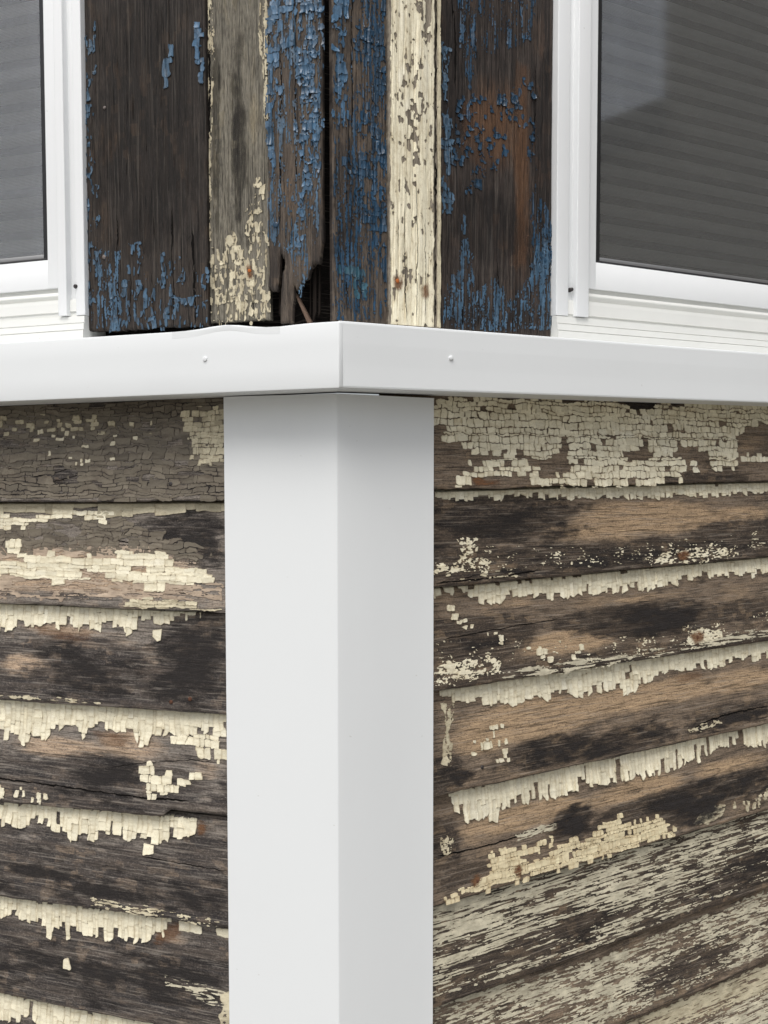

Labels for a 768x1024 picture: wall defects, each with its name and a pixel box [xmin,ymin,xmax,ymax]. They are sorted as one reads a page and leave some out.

peeling [84,0,552,333]
peeling [434,396,768,501]
peeling [0,397,225,641]
peeling [434,531,768,630]
peeling [0,785,197,855]
peeling [0,695,227,764]
peeling [434,611,768,766]
peeling [448,720,768,824]
peeling [0,896,229,944]
peeling [433,789,768,1024]